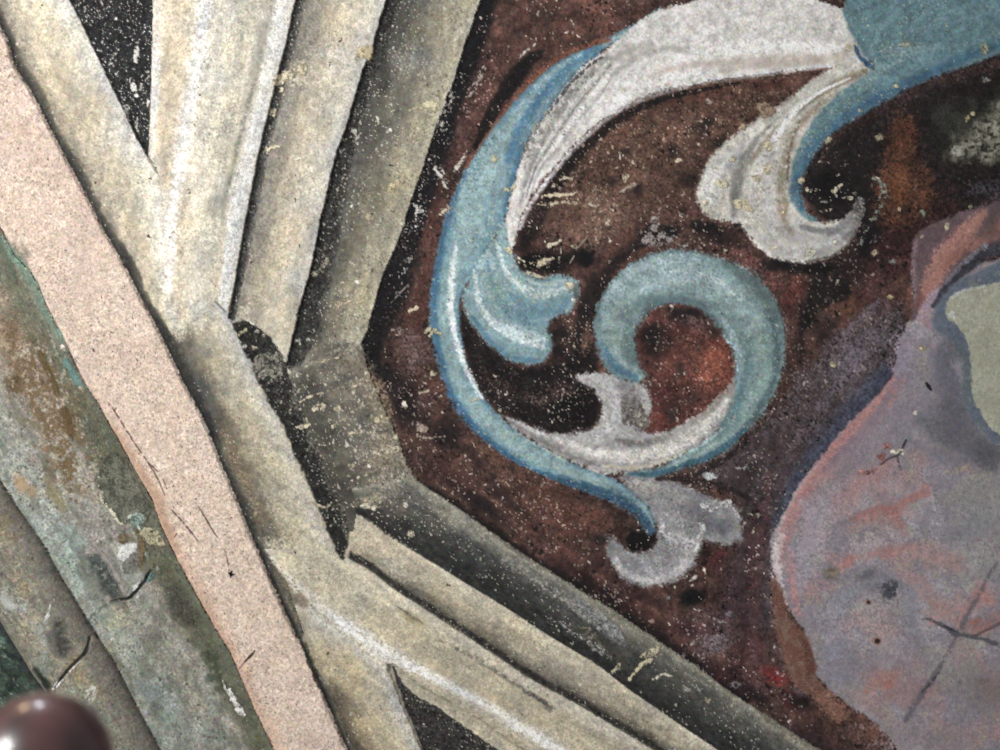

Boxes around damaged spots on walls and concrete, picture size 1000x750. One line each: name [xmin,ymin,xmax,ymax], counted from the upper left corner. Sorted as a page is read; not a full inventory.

crack [108,402,235,578]
crack [50,567,158,691]